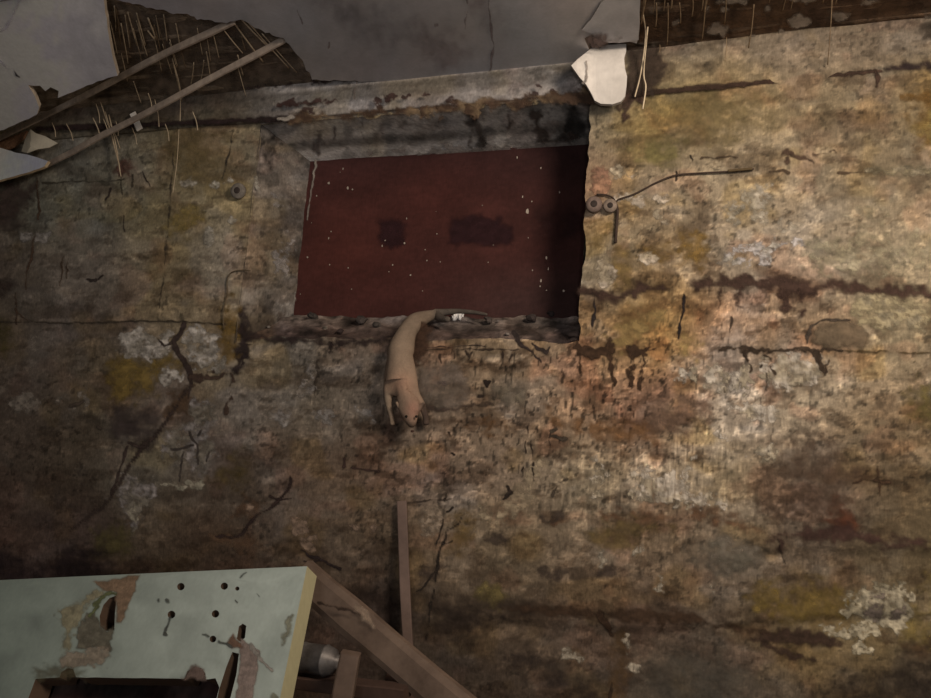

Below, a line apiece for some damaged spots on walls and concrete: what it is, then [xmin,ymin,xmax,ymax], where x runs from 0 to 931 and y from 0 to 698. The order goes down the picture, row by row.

flaking render [639,0,931,65]
crack [0,154,235,528]
crack [215,476,293,539]